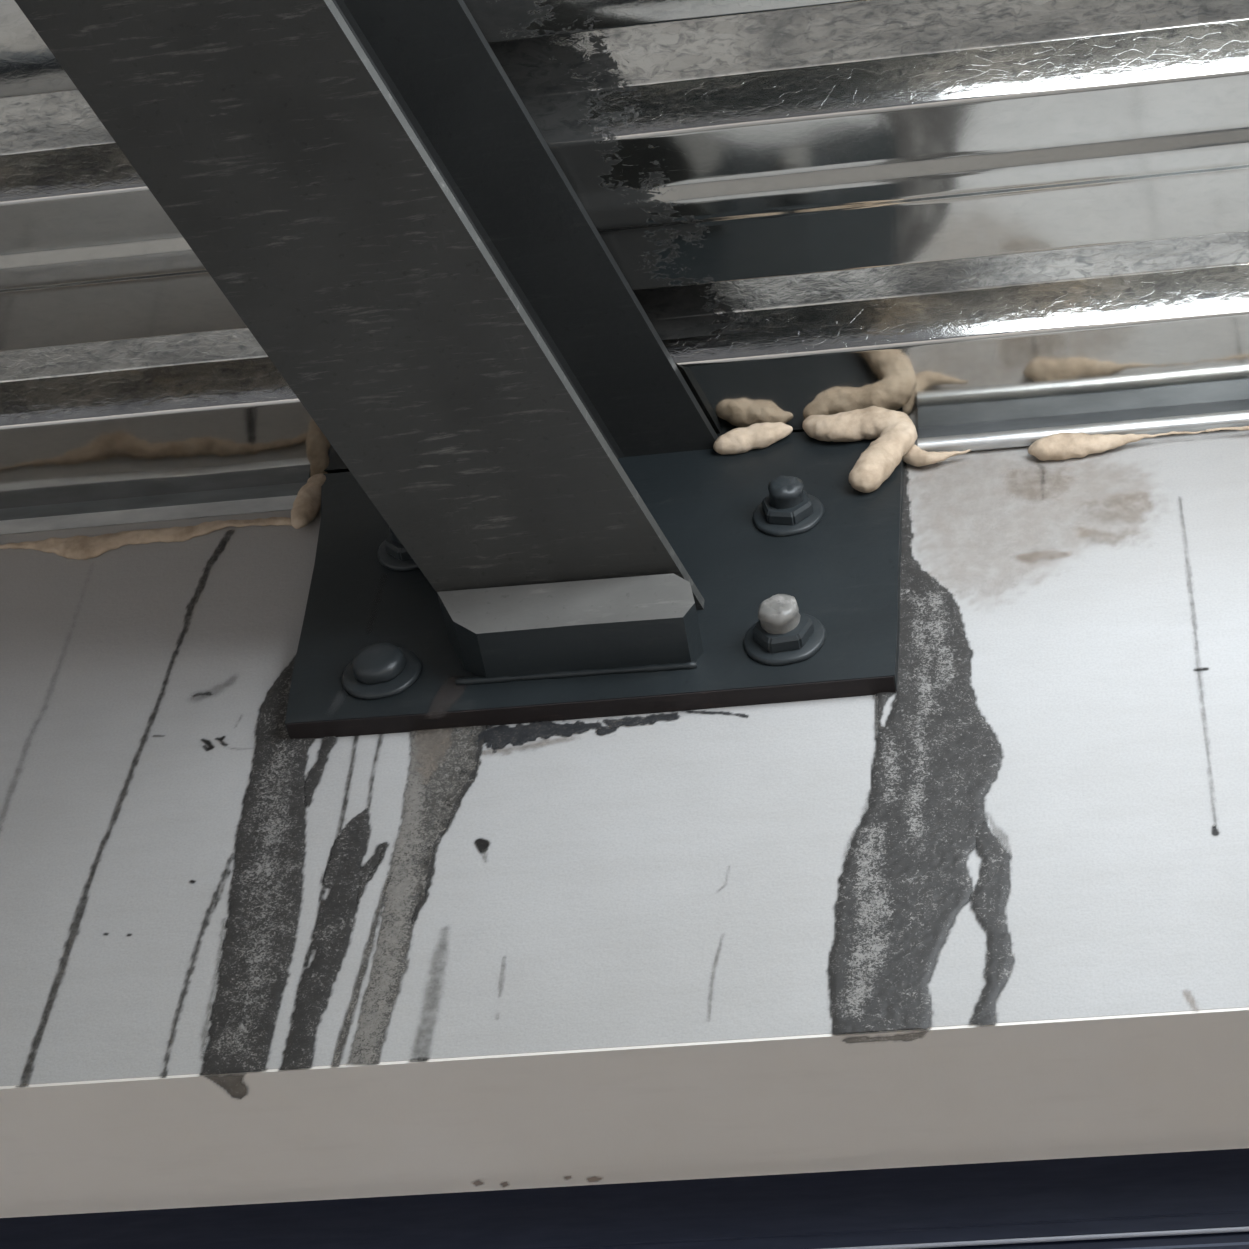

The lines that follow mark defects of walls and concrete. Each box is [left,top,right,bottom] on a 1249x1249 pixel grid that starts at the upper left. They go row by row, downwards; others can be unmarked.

damp [200,655,371,1075]
damp [348,725,488,1065]
damp [828,462,1003,1035]